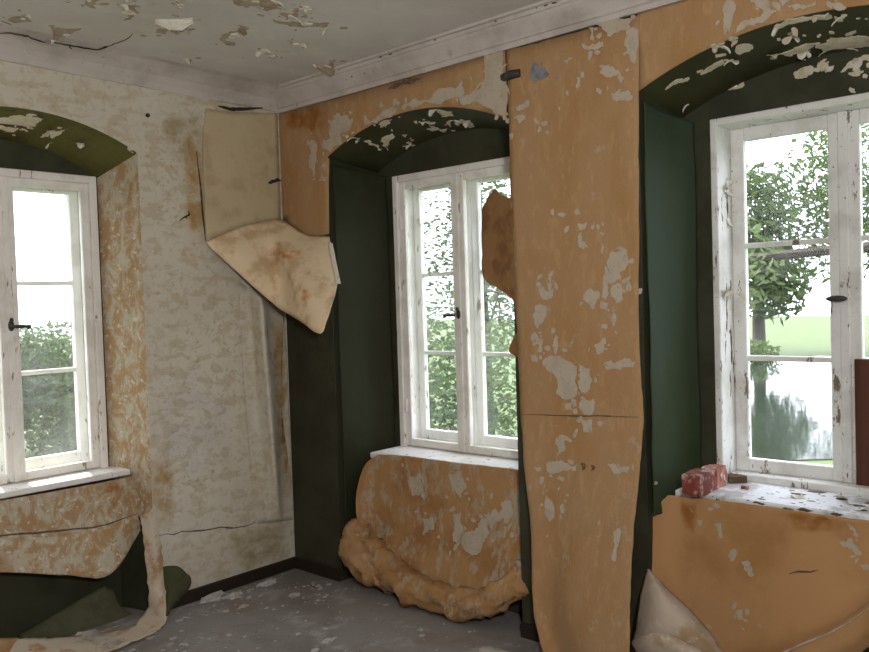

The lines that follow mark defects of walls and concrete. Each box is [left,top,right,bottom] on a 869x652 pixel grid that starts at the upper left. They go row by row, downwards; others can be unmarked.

crack [0,32,133,50]
peeling [140,0,202,37]
peeling [215,25,249,46]
peeling [232,0,329,49]
peeling [582,12,642,101]
peeling [665,0,869,93]
peeling [0,114,64,149]
peeling [306,51,549,181]
peeling [551,208,643,370]
peeling [531,271,603,521]
peeling [782,490,869,571]
peeling [76,625,125,651]